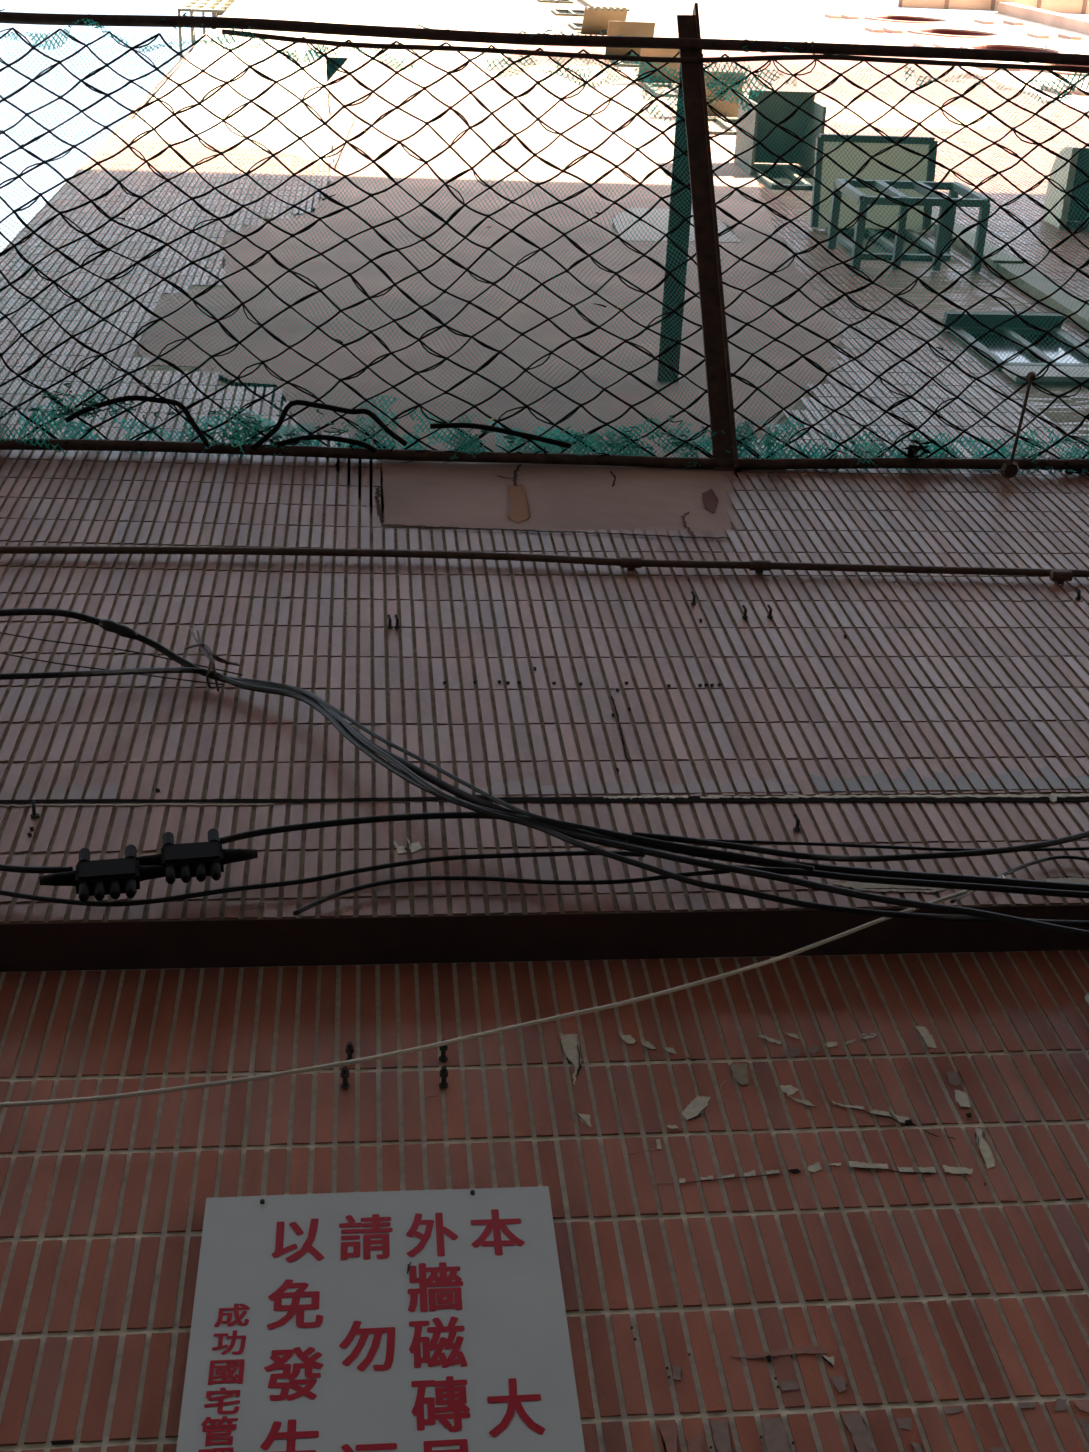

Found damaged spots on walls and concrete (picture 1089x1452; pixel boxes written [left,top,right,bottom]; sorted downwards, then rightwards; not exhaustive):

peeling [560,1034,582,1085]
peeling [620,1035,677,1055]
peeling [915,1026,937,1048]
peeling [655,1096,711,1150]
peeling [780,1085,909,1123]
peeling [954,1090,970,1108]
peeling [808,1127,995,1185]
peeling [679,1170,779,1184]